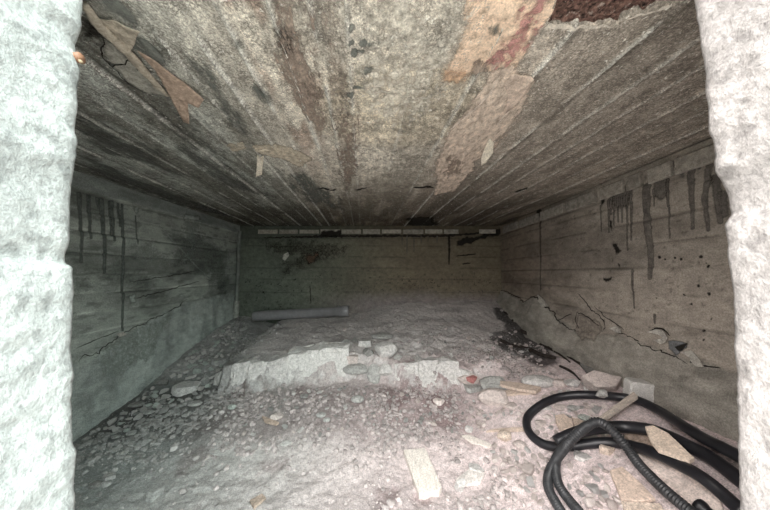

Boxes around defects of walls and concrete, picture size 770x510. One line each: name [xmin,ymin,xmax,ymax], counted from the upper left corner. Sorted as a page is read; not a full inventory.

peeling [100,39,166,97]
leakage [79,155,230,294]
leakage [600,178,671,280]
leakage [681,163,729,231]
leakage [77,192,170,375]
crack [79,270,199,361]